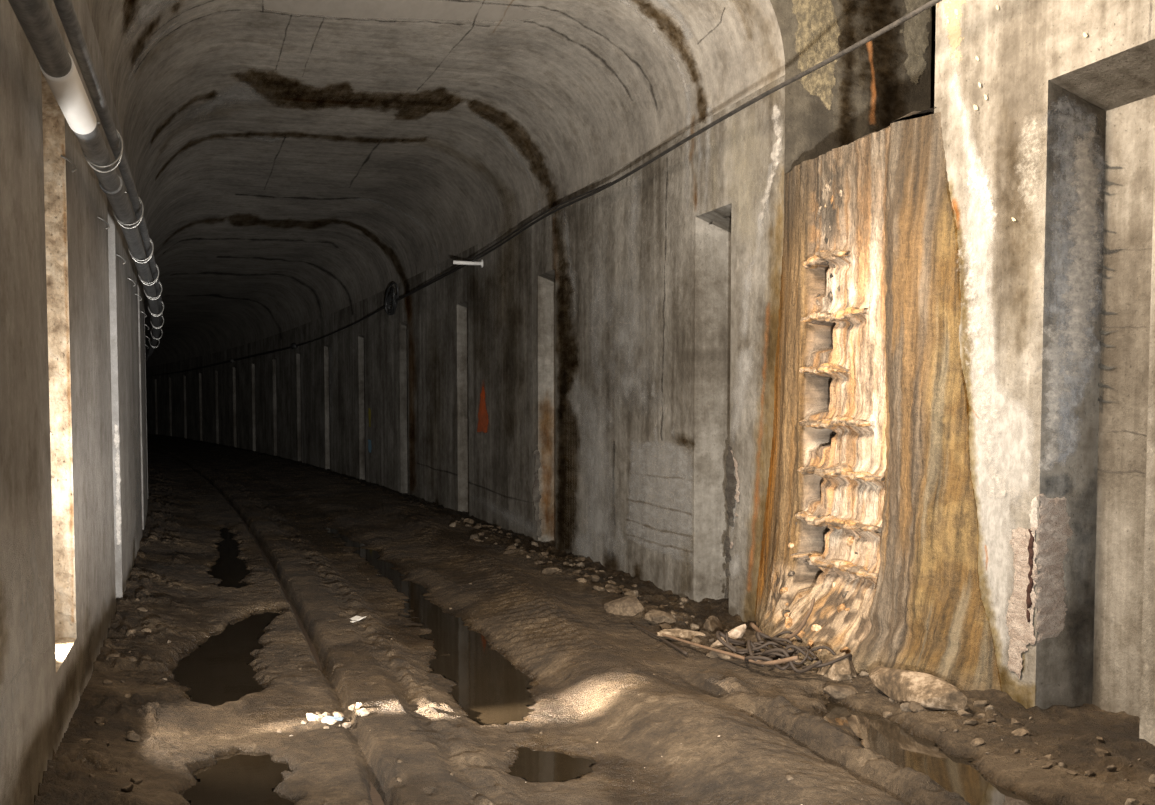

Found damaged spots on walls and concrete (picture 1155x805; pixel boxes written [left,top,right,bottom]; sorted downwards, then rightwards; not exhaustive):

water stain [124,0,178,62]
water stain [203,71,557,208]
water stain [621,0,711,159]
peeling [792,0,839,110]
water stain [1023,120,1039,203]
water stain [204,215,409,293]
water stain [554,222,624,571]
water stain [951,80,1031,663]
spalling [1006,494,1073,679]